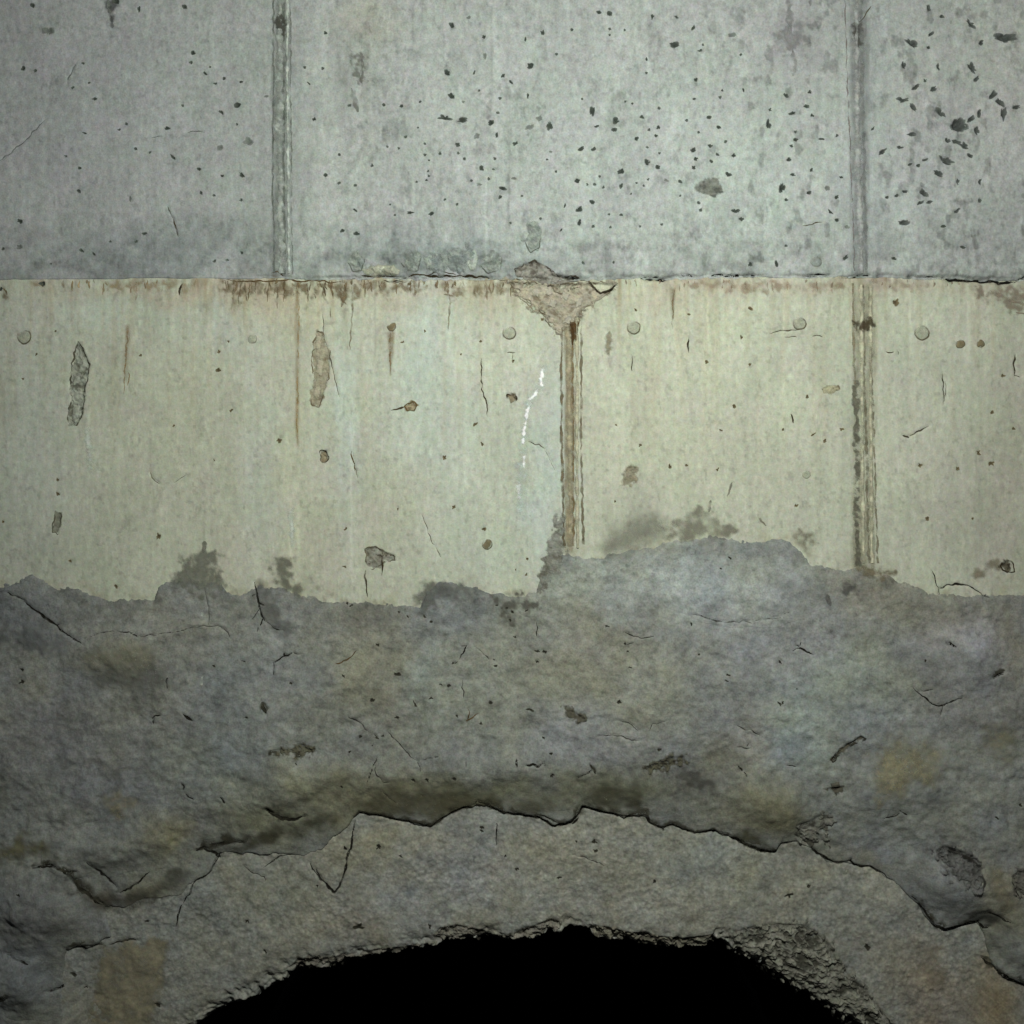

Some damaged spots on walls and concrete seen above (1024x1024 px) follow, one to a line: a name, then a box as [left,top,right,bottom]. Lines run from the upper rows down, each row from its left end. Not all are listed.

corrosion [222,279,464,317]
corrosion [978,285,1024,314]
spalling [67,342,91,426]
leakage [607,500,738,550]
leakage [172,541,223,600]
spalling [364,546,395,596]
crack [248,717,891,893]
leakage [219,815,333,852]
crack [32,860,149,905]
crack [176,834,242,925]
spalling [294,919,561,967]
spalling [728,919,894,1024]